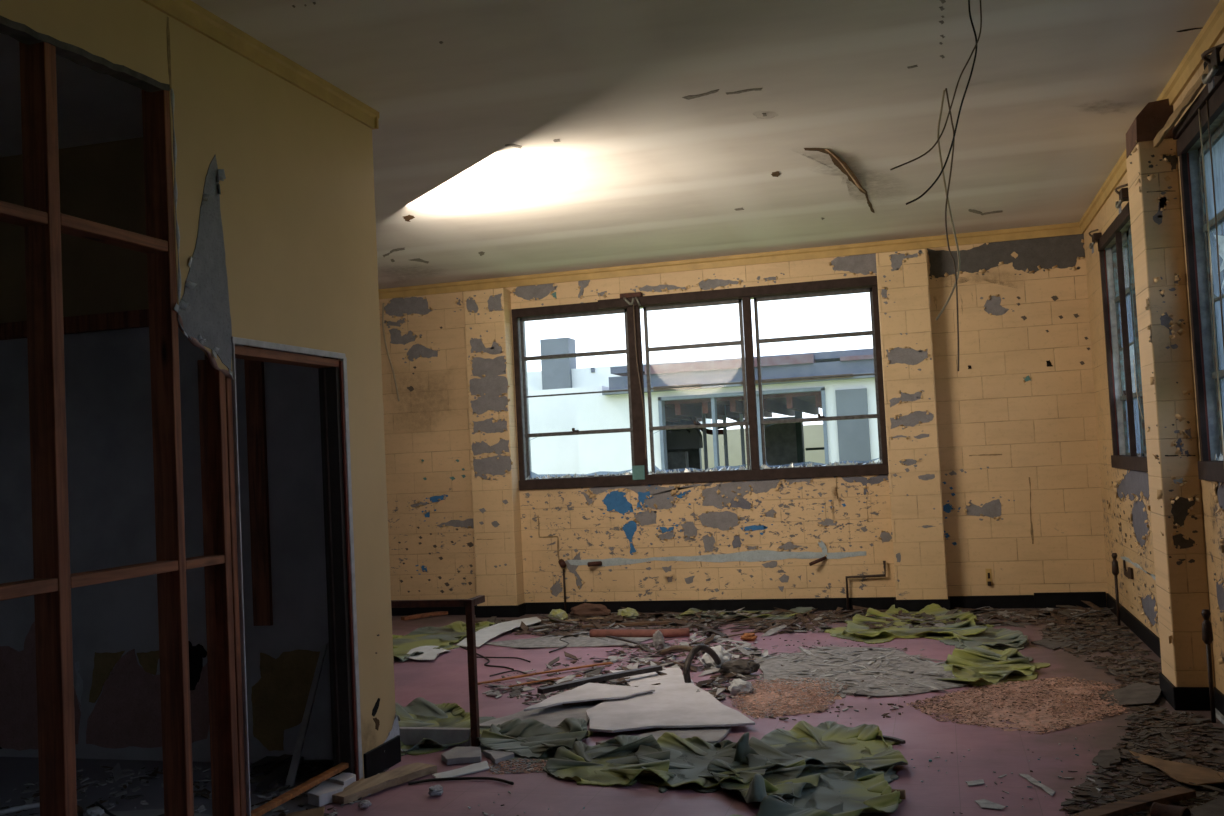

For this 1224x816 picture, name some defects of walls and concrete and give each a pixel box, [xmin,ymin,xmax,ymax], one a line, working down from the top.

peeling [828,234,1085,320]
peeling [379,296,440,392]
peeling [449,283,557,481]
peeling [886,333,932,371]
peeling [889,390,934,441]
peeling [398,495,500,593]
peeling [550,549,586,598]
peeling [569,454,1015,592]
peeling [1122,578,1170,628]
peeling [1107,454,1224,565]
peeling [1213,573,1224,621]
spalling [188,641,207,691]